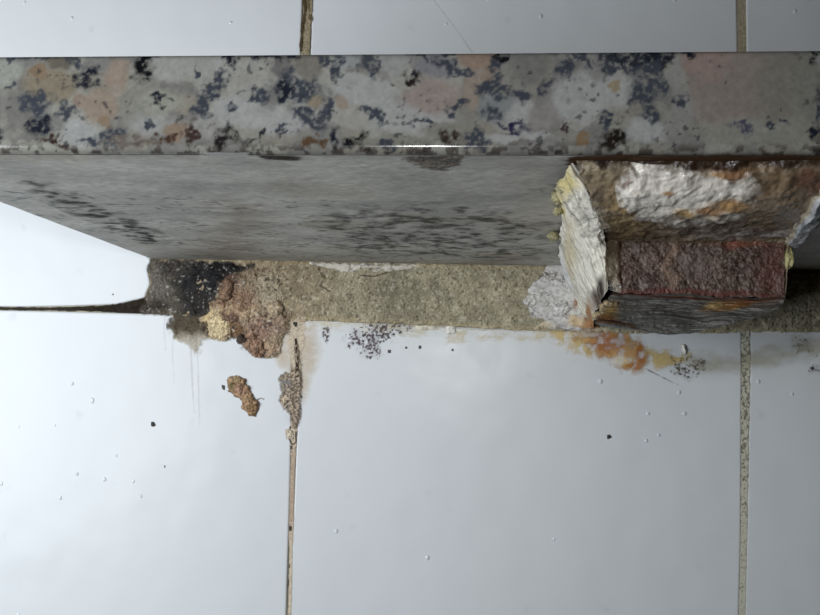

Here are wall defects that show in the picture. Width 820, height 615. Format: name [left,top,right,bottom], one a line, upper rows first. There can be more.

damp [139,259,255,344]
peeling [523,265,786,335]
corrosion [572,330,684,371]
spalling [222,375,260,417]